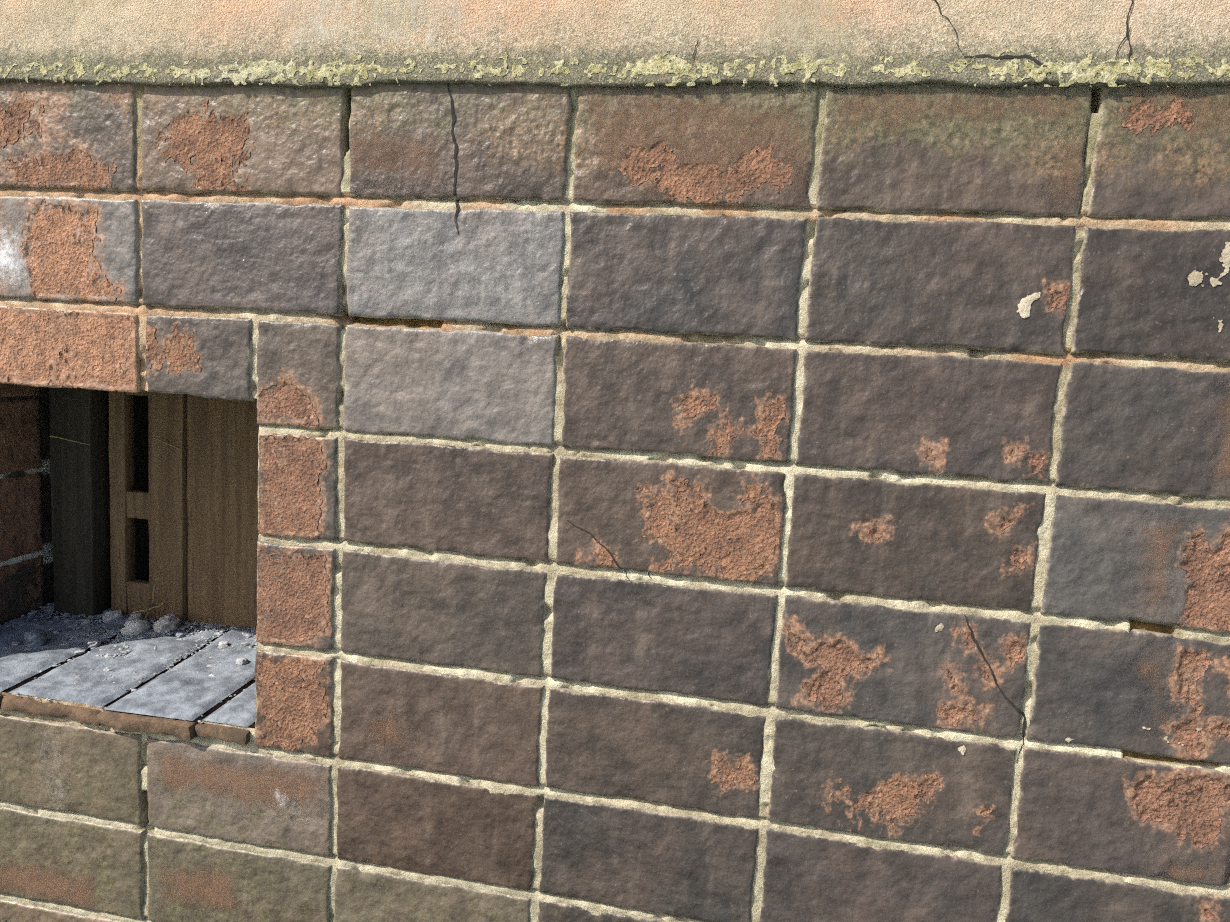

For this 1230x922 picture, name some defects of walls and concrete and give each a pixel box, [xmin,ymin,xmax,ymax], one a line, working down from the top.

crack [934,0,1051,74]
crack [1113,0,1133,64]
crack [447,83,460,235]
spalling [617,135,794,204]
spalling [1114,97,1198,137]
spalling [672,391,789,459]
spalling [635,478,781,582]
spalling [1178,531,1230,631]
spalling [787,625,879,709]
crack [964,615,1026,763]
spalling [1129,649,1230,848]
spalling [821,773,943,833]